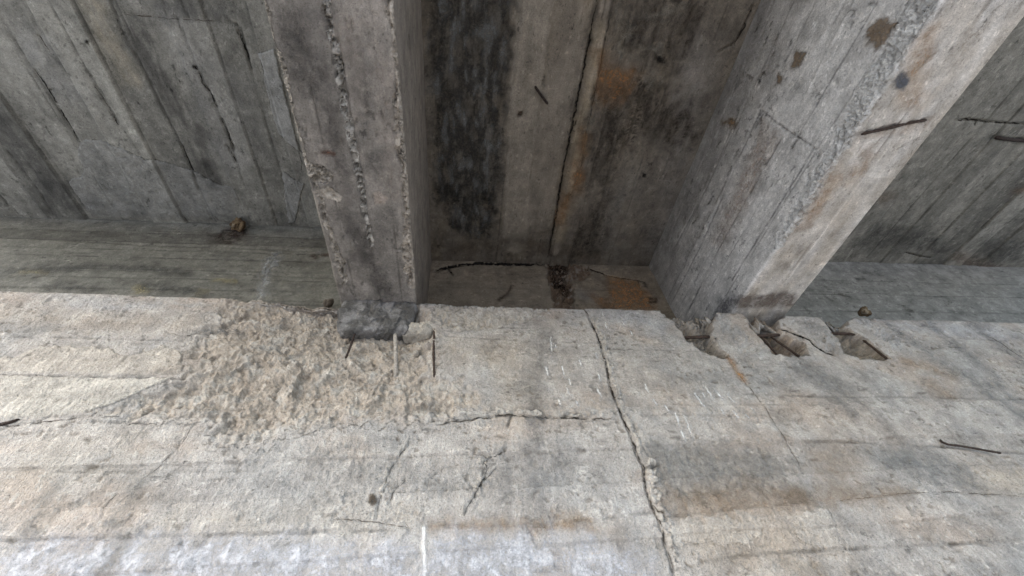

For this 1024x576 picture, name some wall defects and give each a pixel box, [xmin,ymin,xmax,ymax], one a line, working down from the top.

spalling [383,0,416,289]
damp [428,0,513,239]
crack [437,0,643,287]
spalling [0,263,594,453]
crack [447,311,674,570]
rust [591,277,653,310]
spalling [660,312,730,359]
spalling [742,314,811,358]
spalling [820,317,891,361]